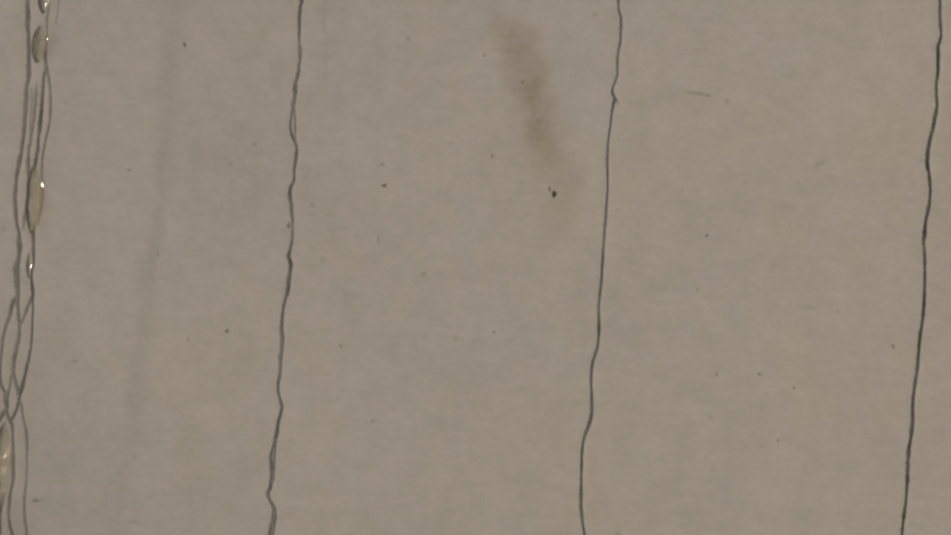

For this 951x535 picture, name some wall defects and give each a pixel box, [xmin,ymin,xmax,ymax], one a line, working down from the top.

crack [0,0,59,535]
crack [266,0,303,535]
crack [579,0,622,535]
crack [900,0,942,535]